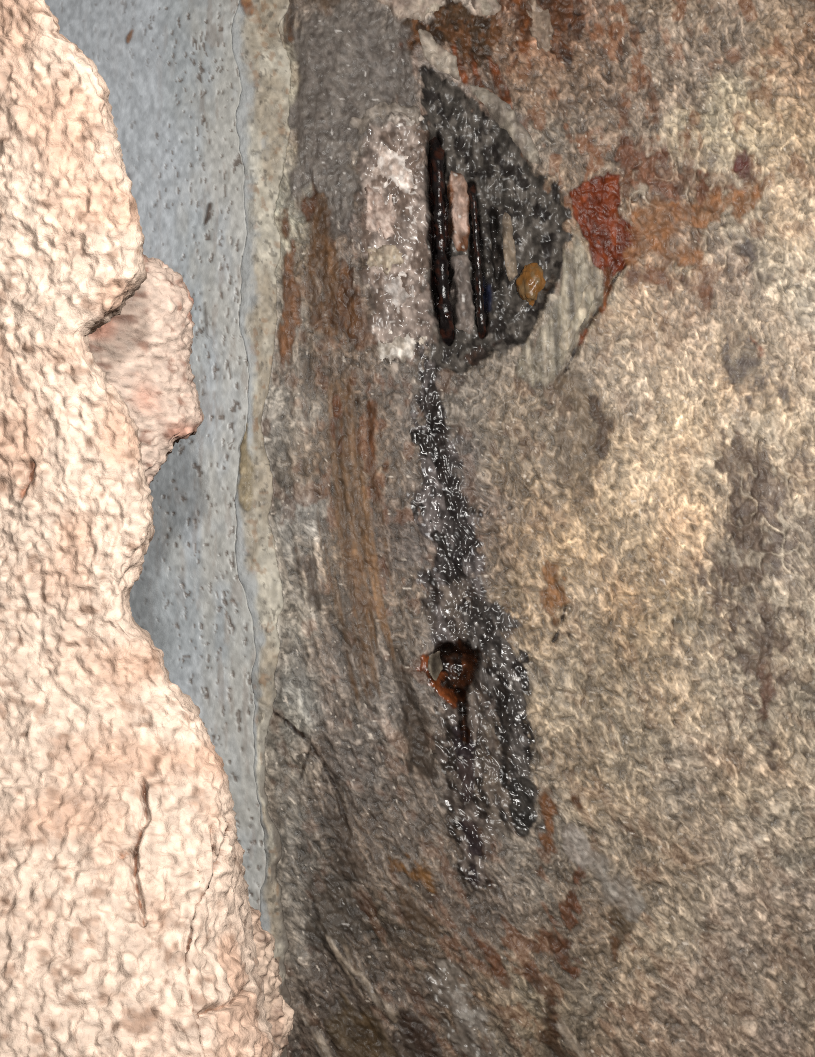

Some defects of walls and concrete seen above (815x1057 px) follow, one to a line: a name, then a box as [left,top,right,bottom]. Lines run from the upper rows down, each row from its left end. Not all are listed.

spalling [288,0,603,387]
corrosion [569,135,761,313]
damp [407,337,546,888]